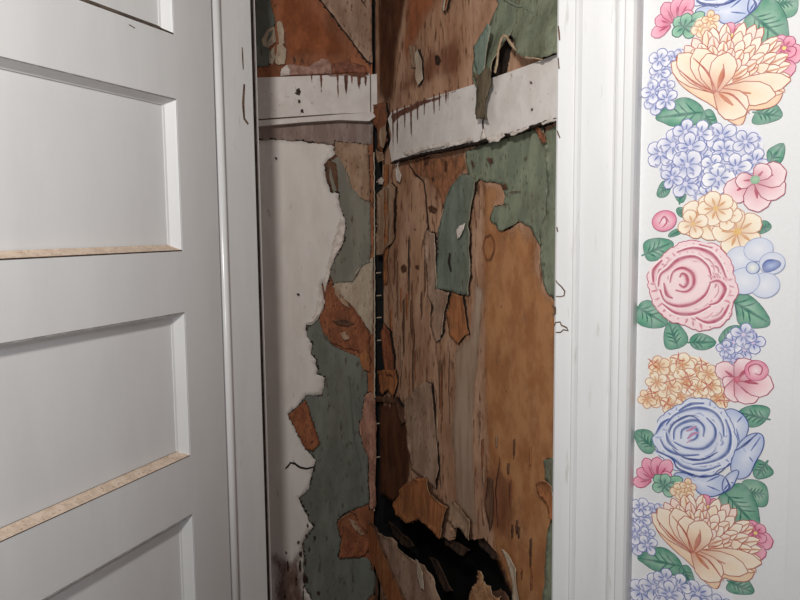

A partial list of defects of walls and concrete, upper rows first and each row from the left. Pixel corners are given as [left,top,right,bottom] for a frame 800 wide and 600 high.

peeling [261,21,286,65]
peeling [409,46,424,87]
peeling [258,102,391,600]
spalling [384,495,512,600]